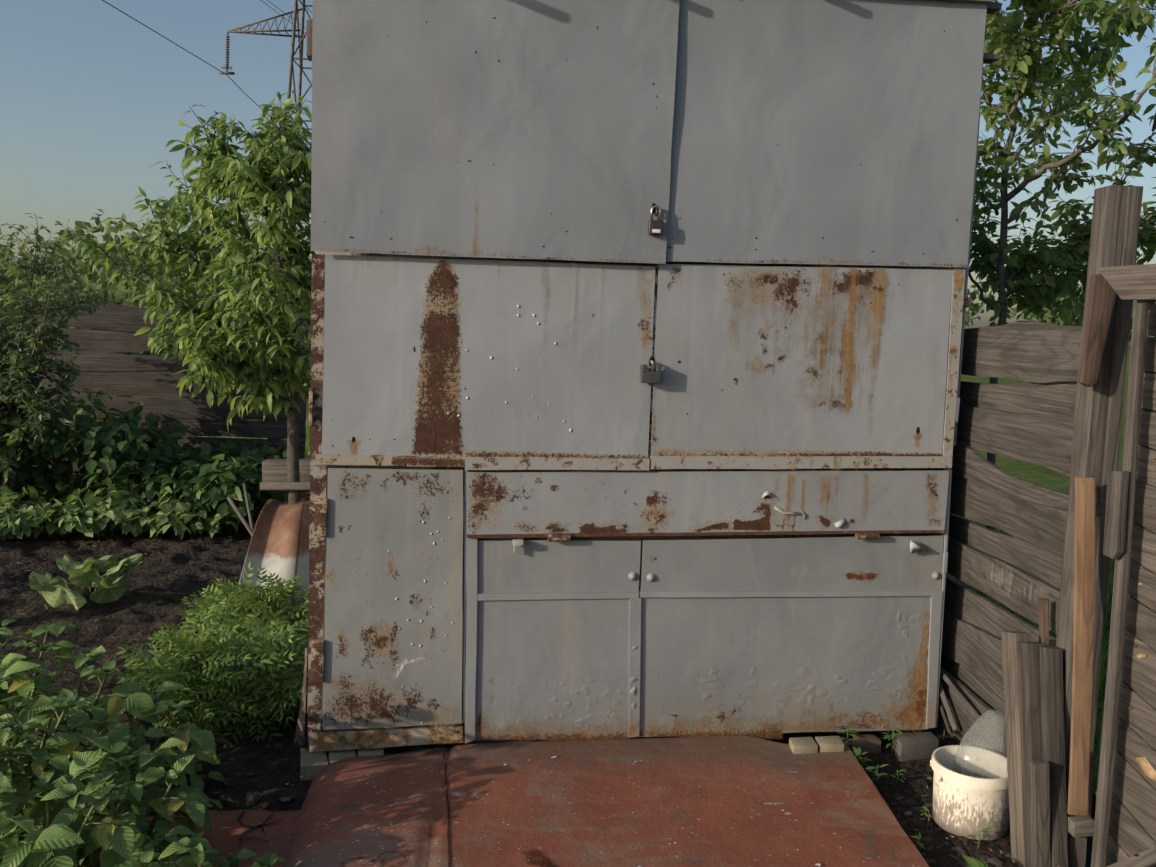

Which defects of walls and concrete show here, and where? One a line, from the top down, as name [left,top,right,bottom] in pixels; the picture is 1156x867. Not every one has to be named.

corrosion [339,247,967,534]
corrosion [845,570,878,581]
corrosion [360,620,399,669]
corrosion [323,673,456,728]
corrosion [476,612,930,742]